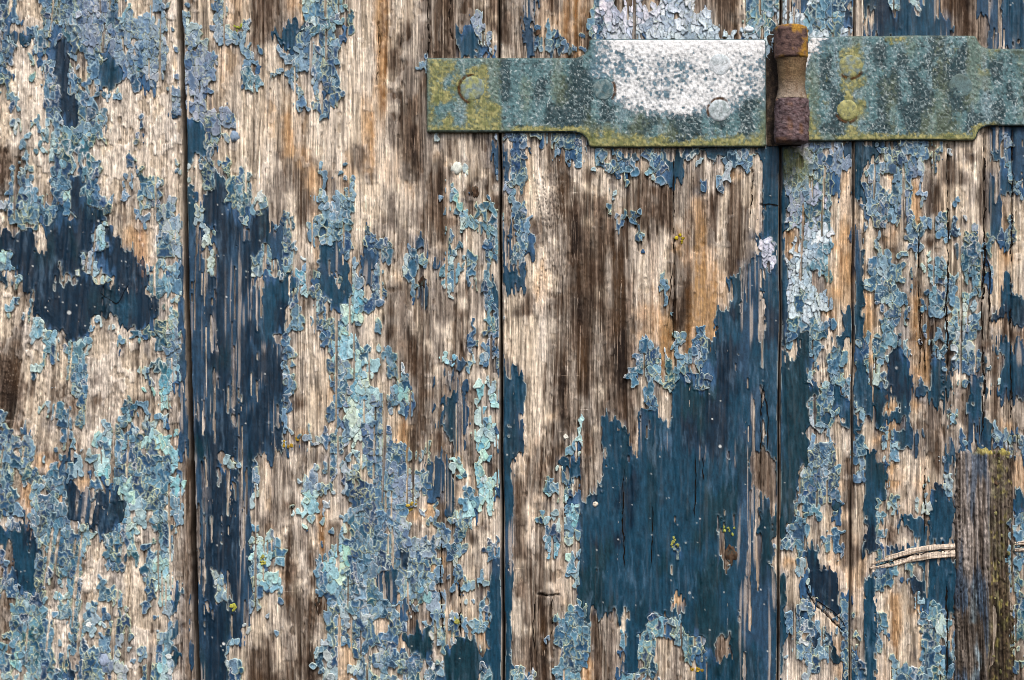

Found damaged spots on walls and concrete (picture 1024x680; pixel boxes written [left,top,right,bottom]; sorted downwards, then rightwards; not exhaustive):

peeling [520,0,955,60]
peeling [0,0,589,680]
peeling [534,126,1024,680]